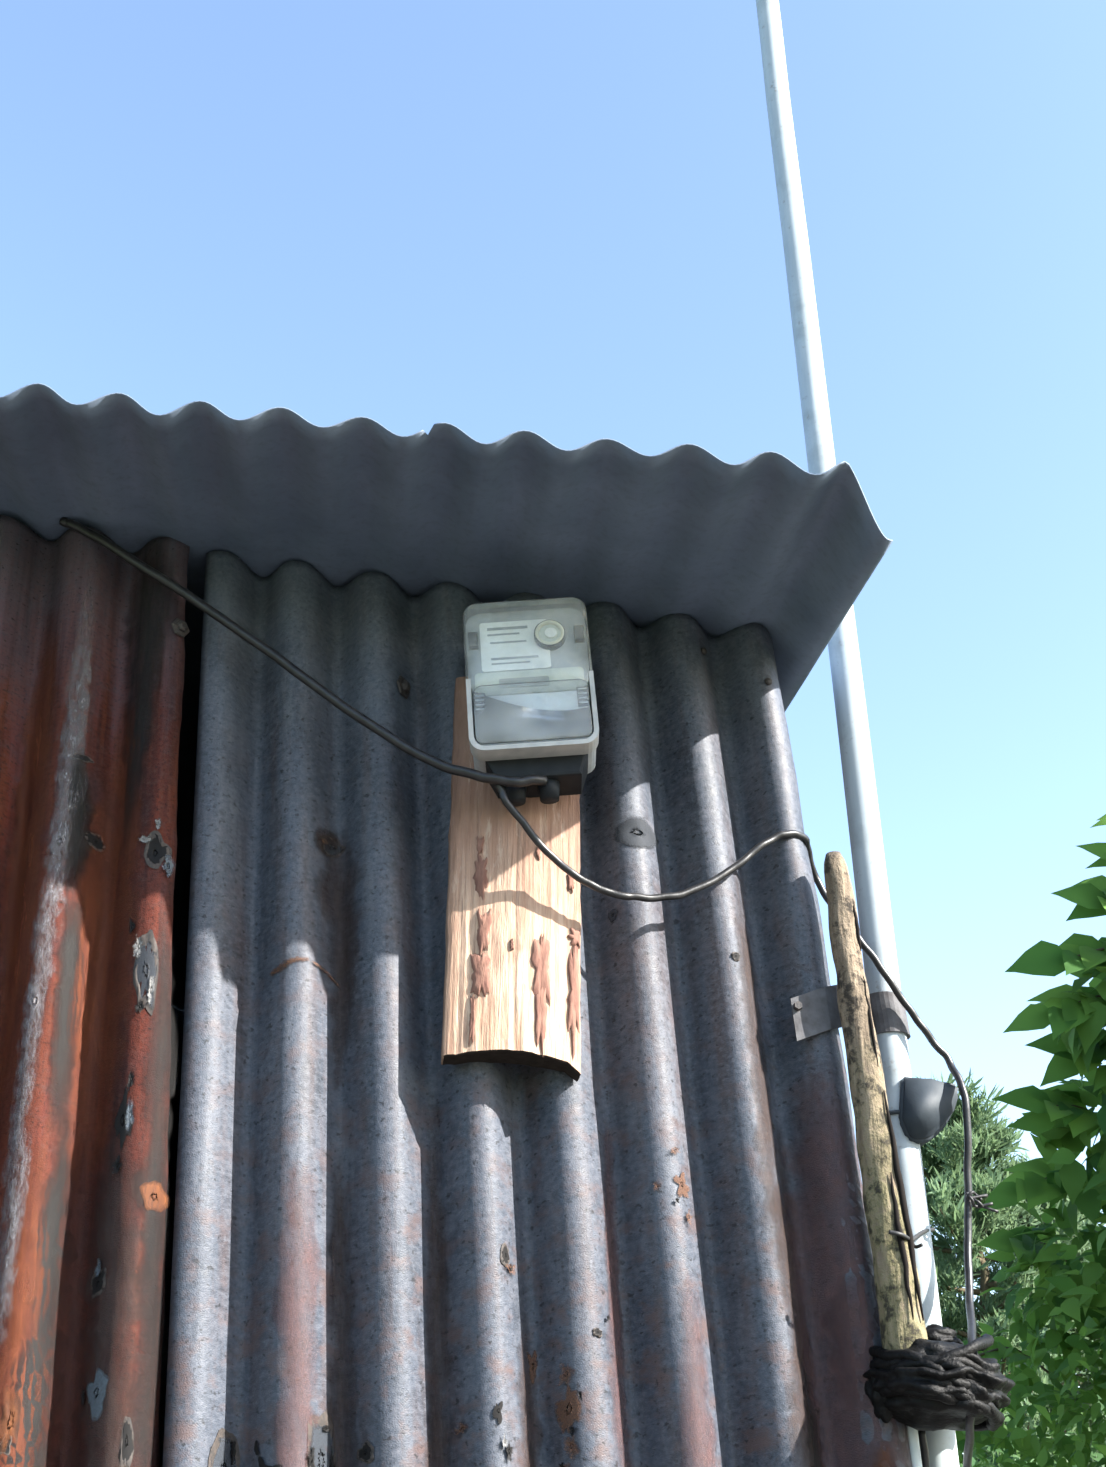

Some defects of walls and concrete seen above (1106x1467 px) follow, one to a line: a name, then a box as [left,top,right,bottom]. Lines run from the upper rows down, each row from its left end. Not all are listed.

corrosion [1,663,52,1082]
peeling [129,918,159,1016]
peeling [112,1071,135,1174]
corrosion [141,1182,168,1211]
corrosion [0,1177,137,1467]
peeling [81,1369,109,1420]
corrosion [521,1350,540,1467]
corrosion [555,1363,582,1467]